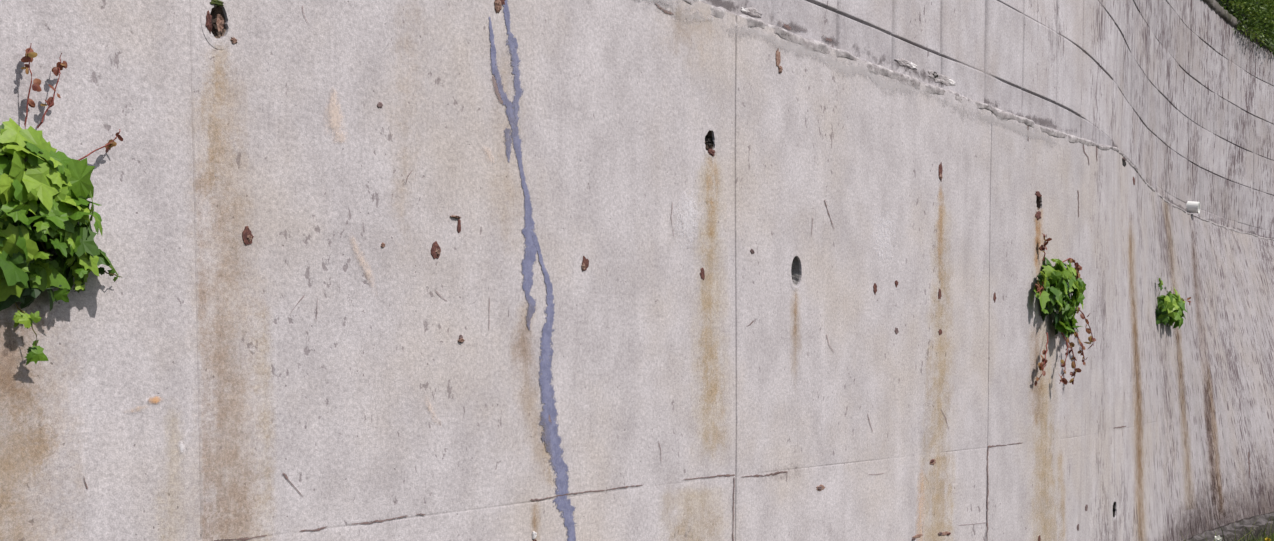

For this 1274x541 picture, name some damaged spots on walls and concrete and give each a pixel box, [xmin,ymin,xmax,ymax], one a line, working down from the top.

crack [489,0,577,541]